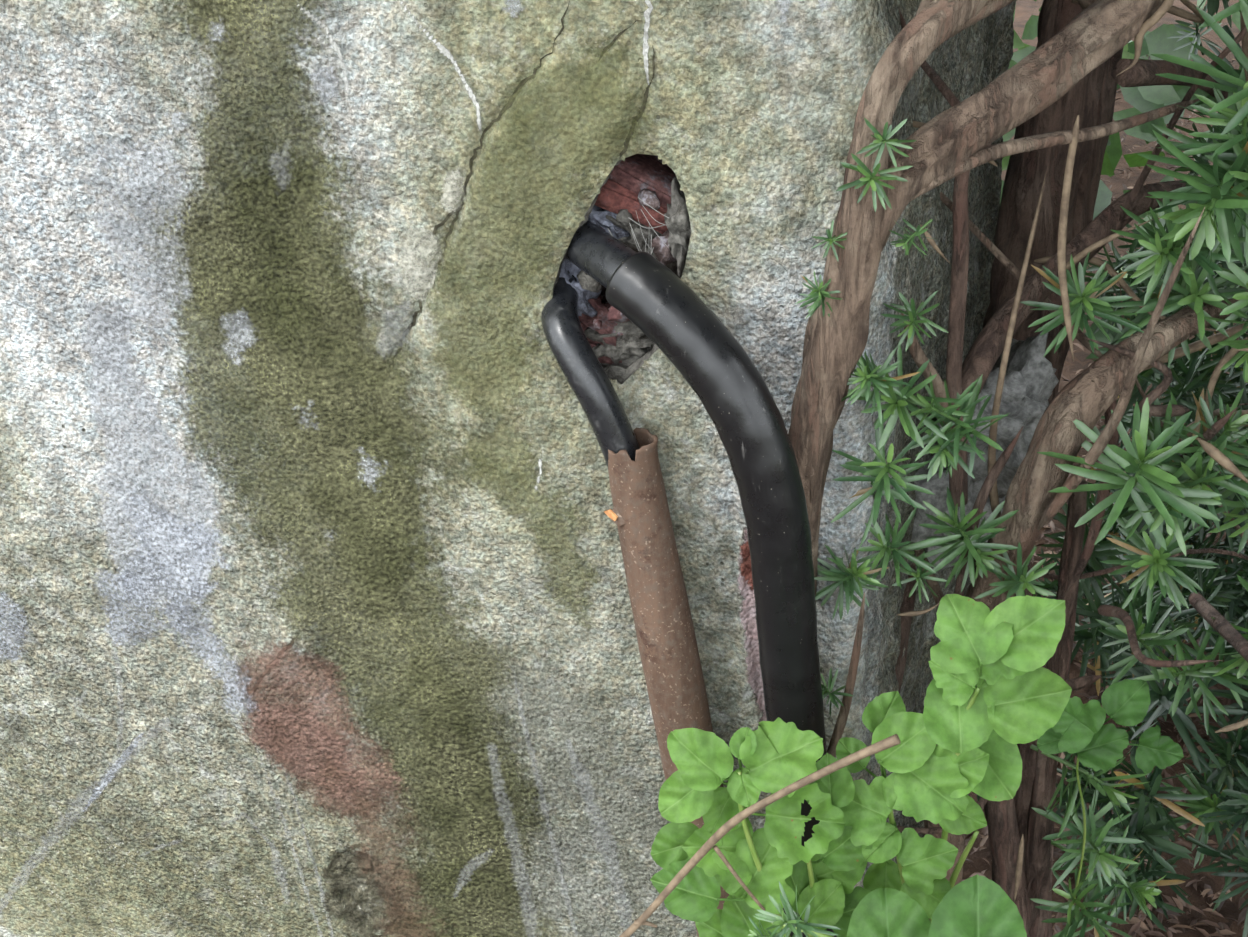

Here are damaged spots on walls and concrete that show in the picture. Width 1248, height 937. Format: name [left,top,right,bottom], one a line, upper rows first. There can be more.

damp [297,4,349,91]
damp [400,1,481,129]
crack [378,0,570,389]
damp [184,157,692,937]
rust [235,642,399,815]